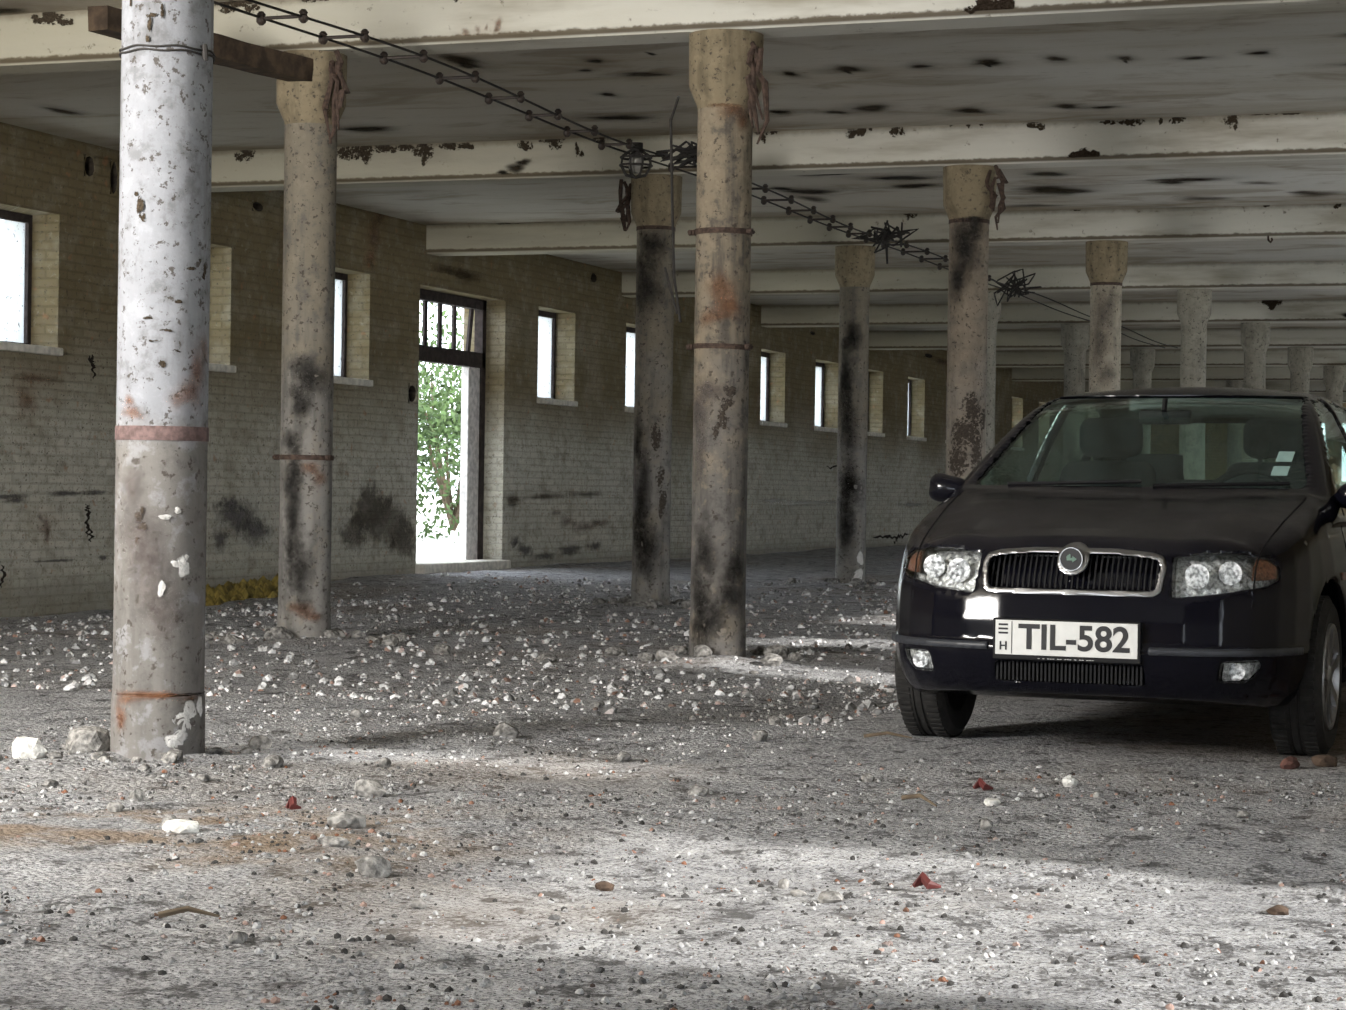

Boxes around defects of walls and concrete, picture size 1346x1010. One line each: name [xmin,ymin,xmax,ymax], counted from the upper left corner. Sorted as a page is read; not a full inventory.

spalling [960,0,1015,14]
leakage [1014,172,1088,207]
leakage [951,216,982,295]
leakage [290,360,324,416]
leakage [285,432,309,601]
flaking render [171,554,190,577]
leakage [693,540,742,637]
flaking render [164,696,202,749]